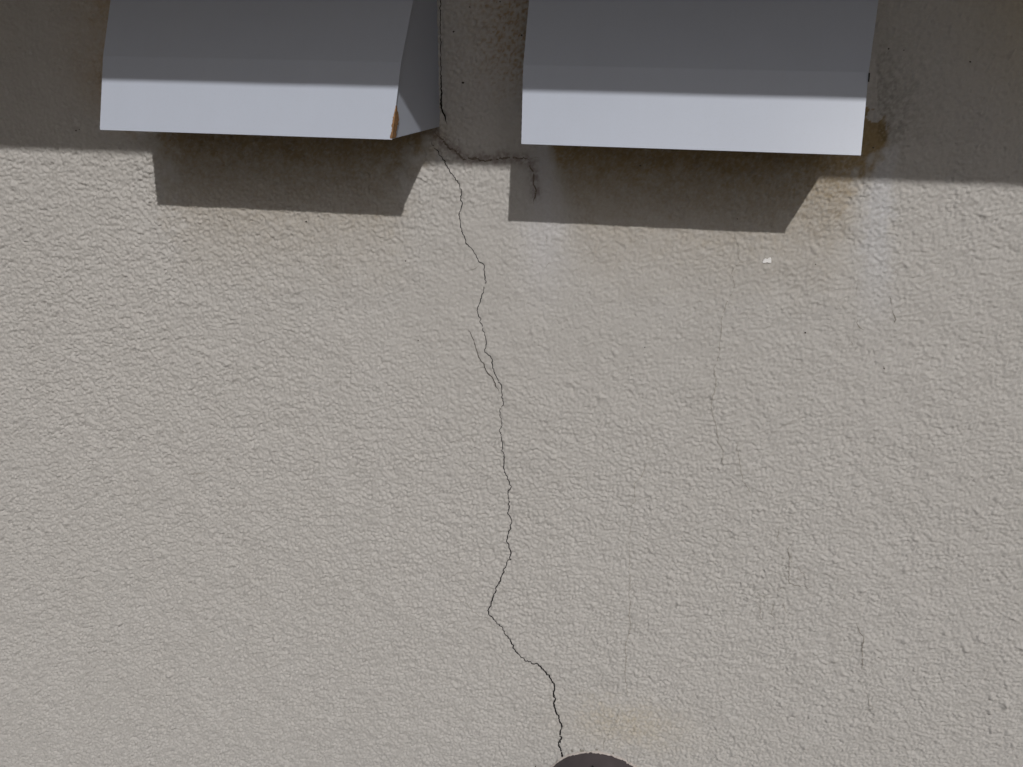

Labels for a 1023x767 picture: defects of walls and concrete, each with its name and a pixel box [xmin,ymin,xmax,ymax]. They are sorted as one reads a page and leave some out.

crack [431,0,563,757]